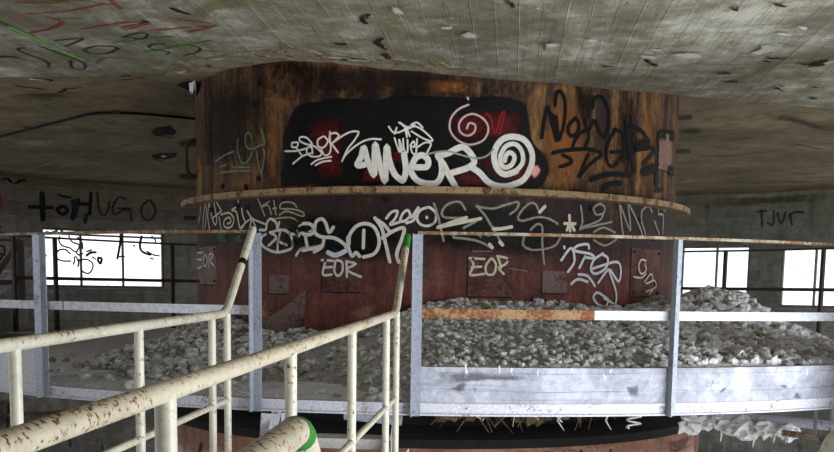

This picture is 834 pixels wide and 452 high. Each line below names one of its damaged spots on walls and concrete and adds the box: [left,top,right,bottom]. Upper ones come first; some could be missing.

spalling [751,33,834,67]
rust [564,118,581,168]
rust [353,307,372,320]